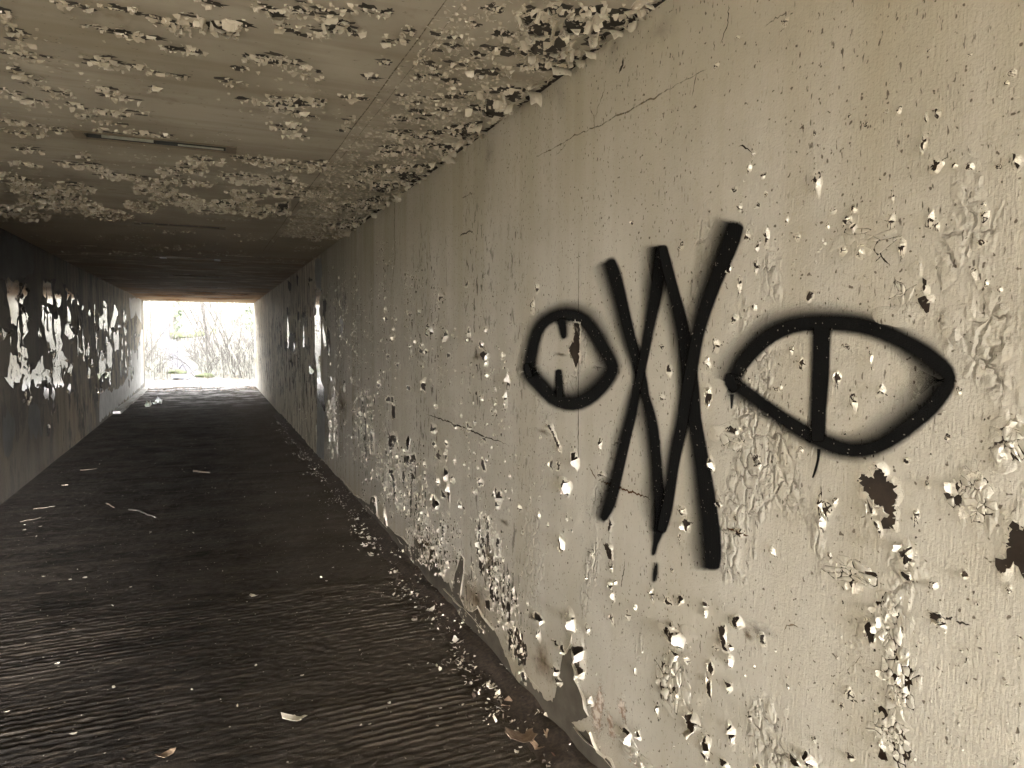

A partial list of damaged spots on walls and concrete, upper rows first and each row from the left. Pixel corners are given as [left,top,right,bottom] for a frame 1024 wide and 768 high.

crack [351,0,665,282]
peeling [796,290,820,306]
peeling [916,278,936,316]
peeling [0,0,658,768]
crack [430,415,506,444]
peeling [854,456,904,540]
peeling [943,469,1024,583]
peeling [639,604,704,712]
peeling [774,553,921,768]